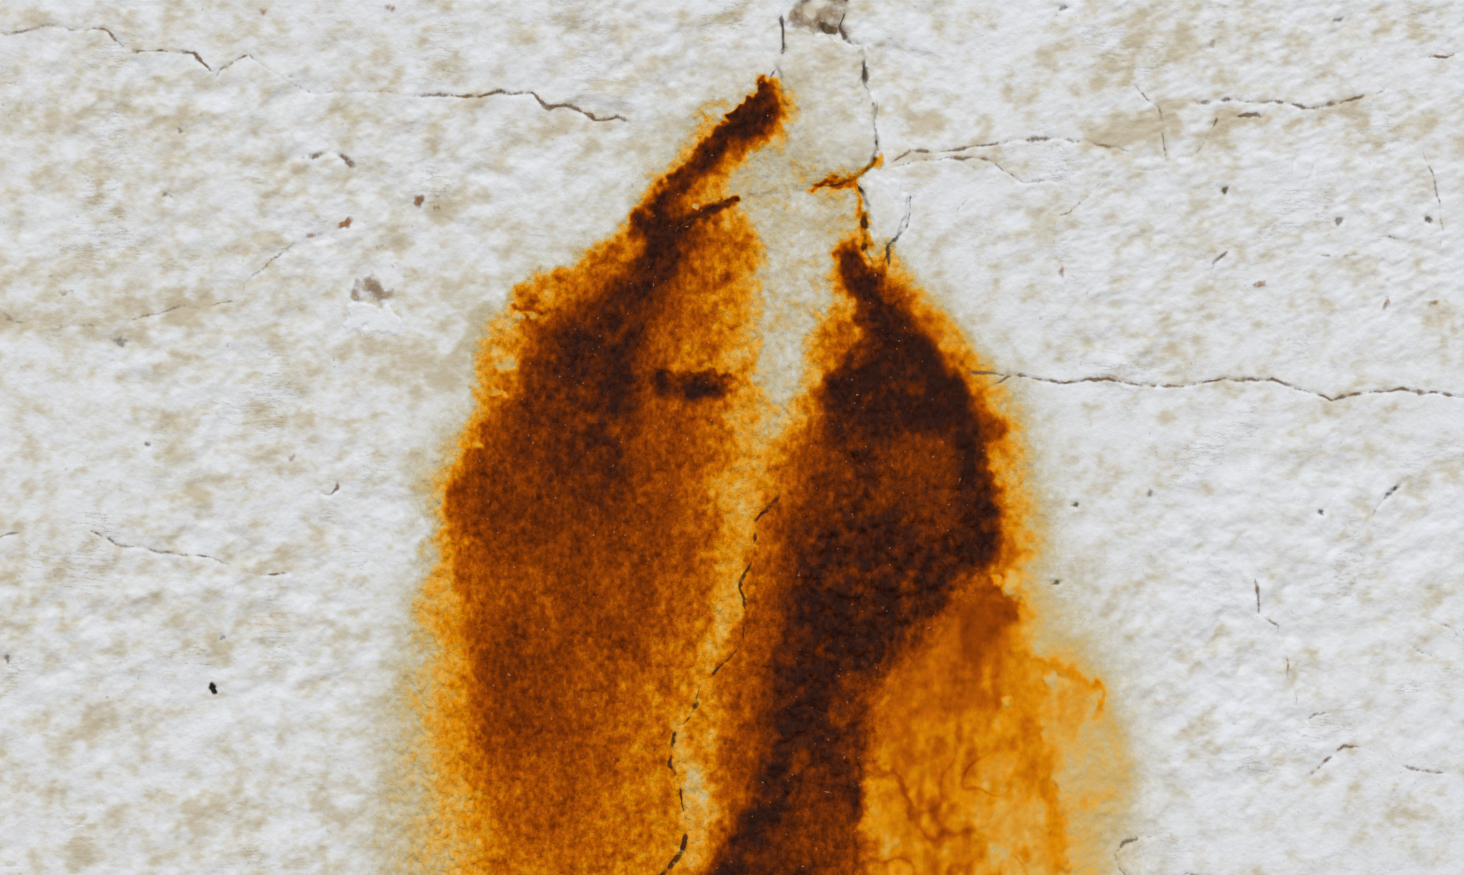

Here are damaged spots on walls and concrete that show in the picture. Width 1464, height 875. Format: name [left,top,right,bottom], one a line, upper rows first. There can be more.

crack [70,28,252,70]
crack [771,16,785,76]
crack [839,0,868,82]
crack [423,89,626,121]
crack [1202,91,1382,121]
crack [671,199,735,236]
crack [818,129,1124,264]
crack [972,371,1452,401]
rust [372,73,1144,875]
crack [660,497,779,875]